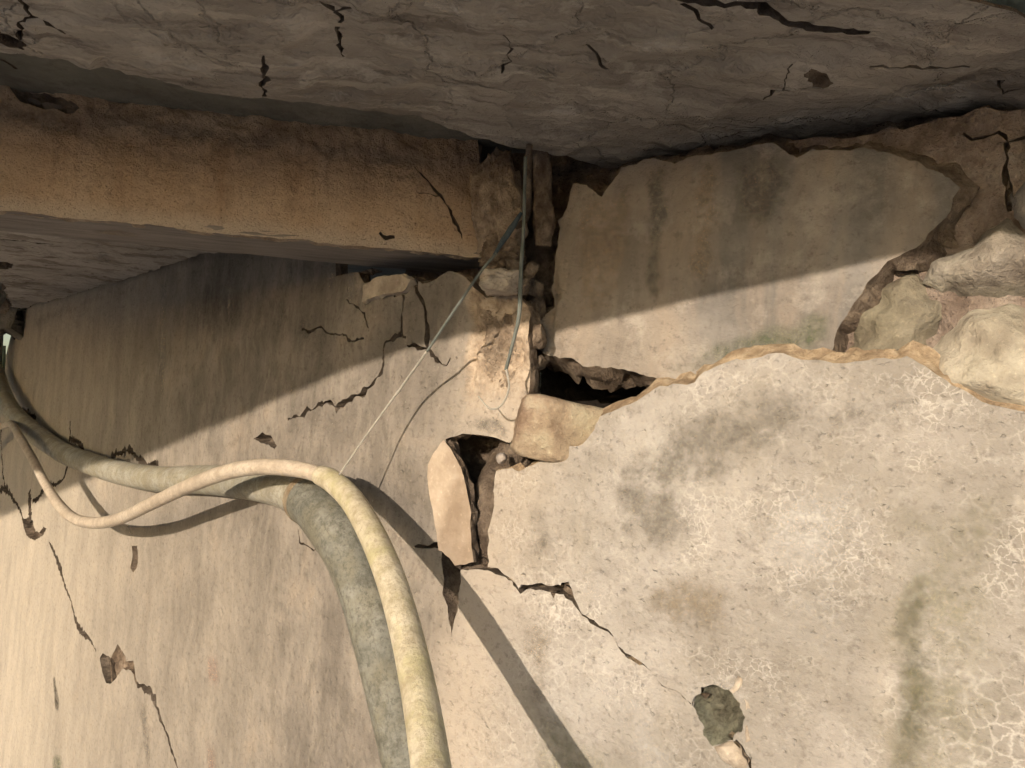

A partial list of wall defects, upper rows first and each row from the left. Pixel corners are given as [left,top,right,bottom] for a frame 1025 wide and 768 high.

crack [15,0,66,40]
crack [677,0,870,35]
crack [963,131,1025,212]
crack [288,277,451,421]
spalling [480,308,523,388]
water stain [658,411,795,479]
crack [0,423,96,651]
flaking render [427,440,479,633]
spalling [100,644,139,685]
crack [458,557,693,704]
crack [137,681,178,768]
crack [736,740,751,768]